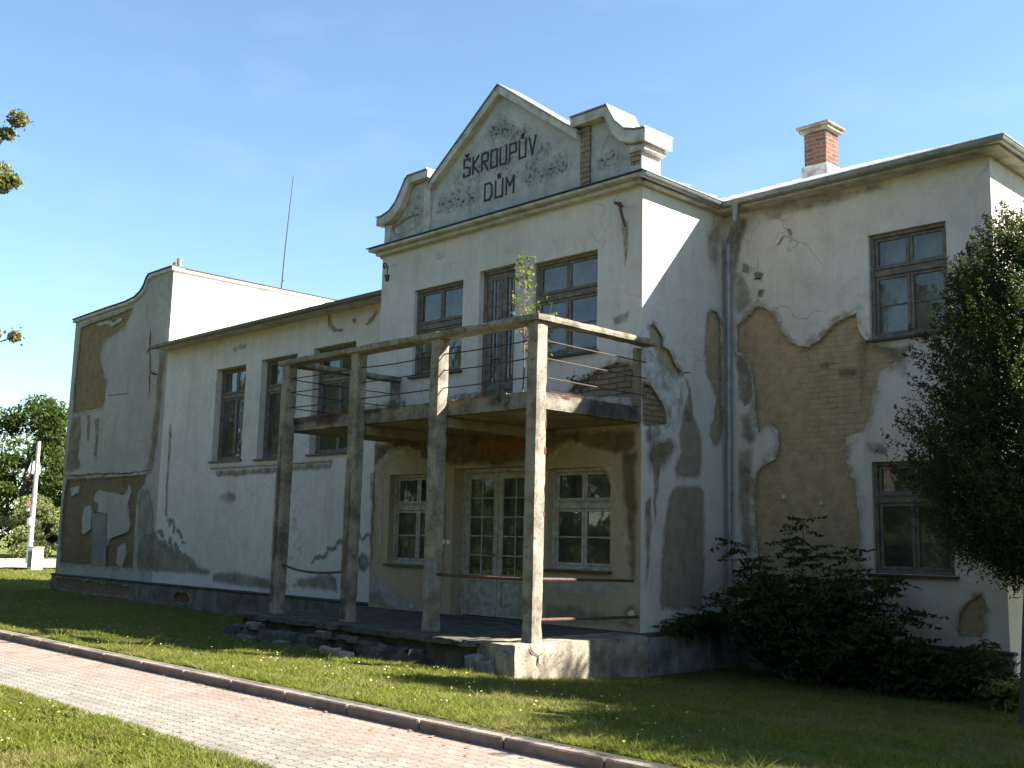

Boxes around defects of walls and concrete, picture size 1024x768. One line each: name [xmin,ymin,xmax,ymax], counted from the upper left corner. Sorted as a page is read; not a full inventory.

spalling [72,307,133,415]
crack [109,332,157,396]
peeling [570,321,686,461]
spalling [705,309,724,445]
spalling [738,264,901,596]
spalling [59,474,147,569]
damp [137,523,271,588]
spalling [959,593,988,638]